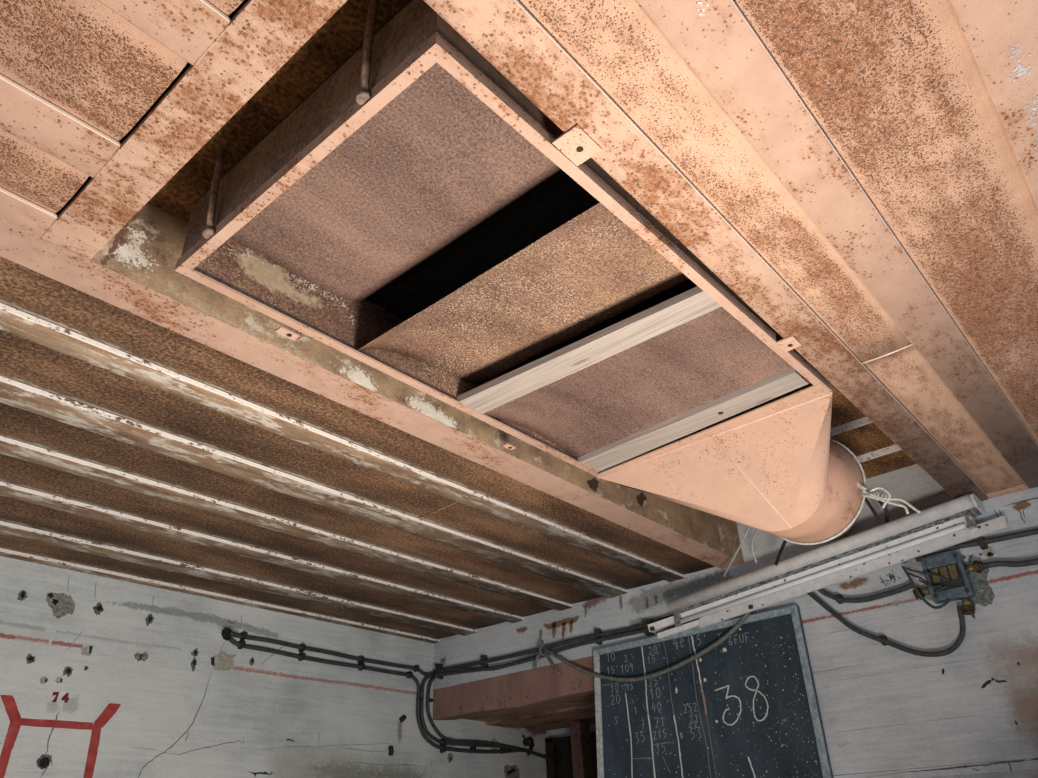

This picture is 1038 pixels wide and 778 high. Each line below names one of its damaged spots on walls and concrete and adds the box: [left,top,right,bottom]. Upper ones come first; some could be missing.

peeling [334,363,381,394]
crack [995,497,1038,524]
rust [840,578,867,590]
peeling [968,547,995,607]
spalling [46,592,75,619]
rust [540,616,579,639]
crack [133,677,433,778]